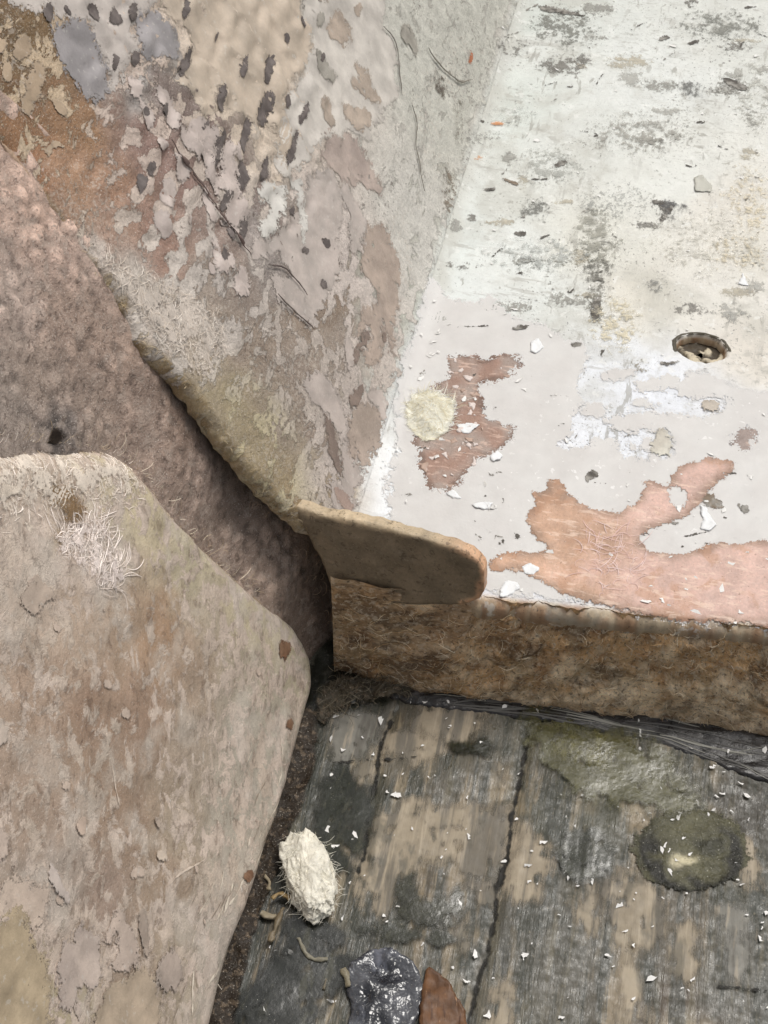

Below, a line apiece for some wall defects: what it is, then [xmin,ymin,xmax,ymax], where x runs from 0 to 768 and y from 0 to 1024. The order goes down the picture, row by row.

crack [171,139,314,329]
peeling [0,0,768,632]